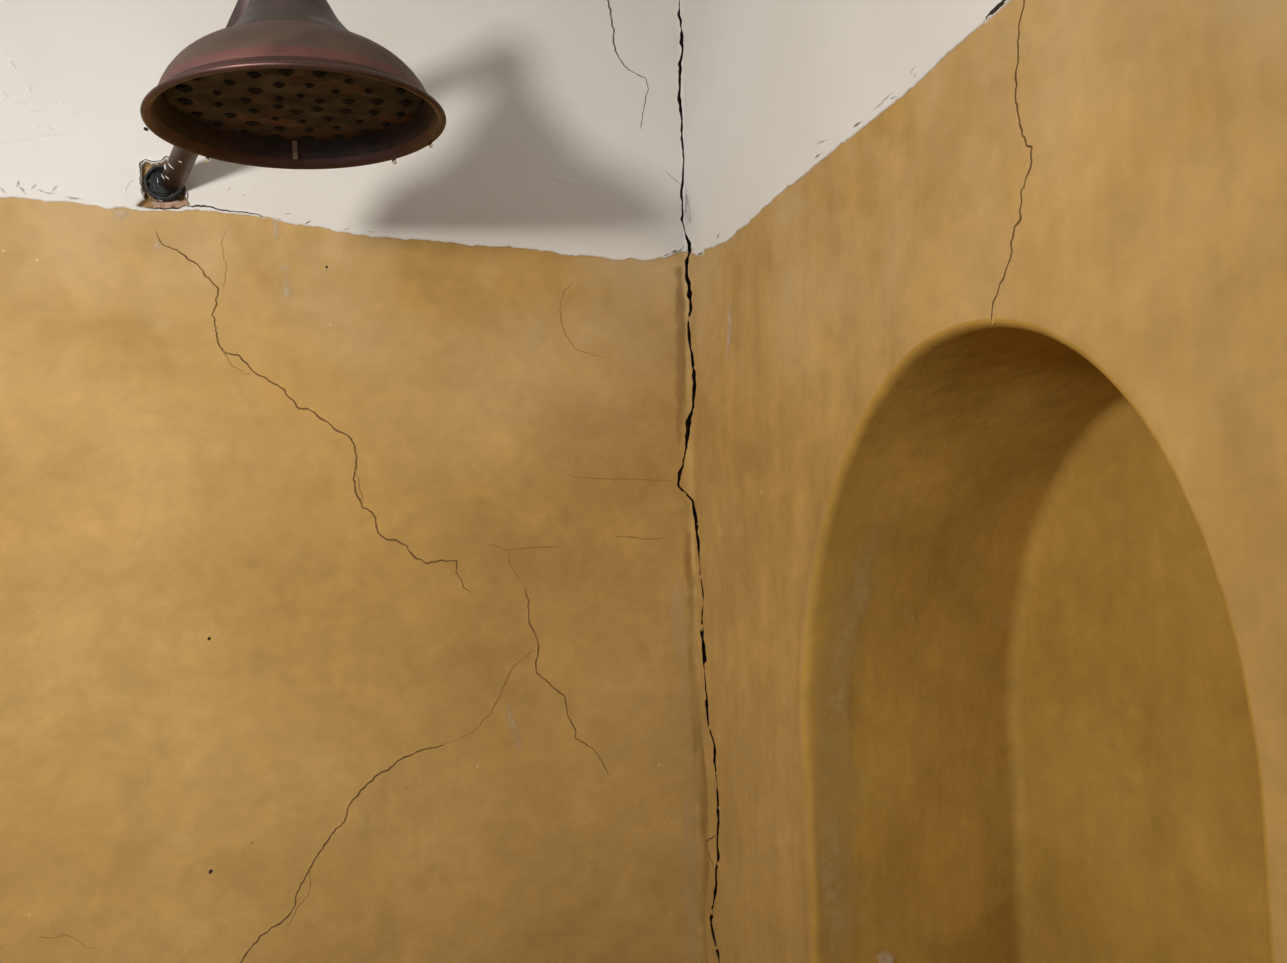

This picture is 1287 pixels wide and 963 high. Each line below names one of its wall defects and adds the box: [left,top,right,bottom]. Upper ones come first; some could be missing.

spalling [0,180,83,200]
crack [984,0,1034,324]
crack [155,205,472,593]
crack [559,0,720,963]
crack [239,544,608,963]